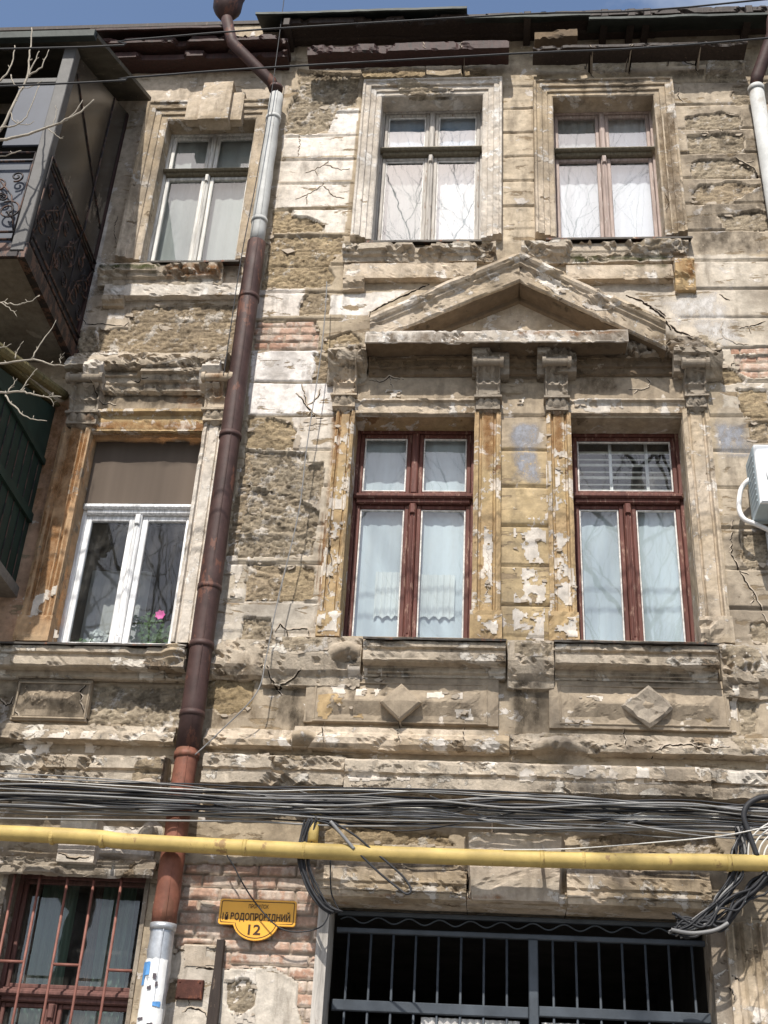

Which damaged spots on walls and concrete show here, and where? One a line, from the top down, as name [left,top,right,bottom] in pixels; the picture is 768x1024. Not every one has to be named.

flaking render [286,67,457,135]
flaking render [685,60,768,232]
flaking render [77,303,238,361]
flaking render [253,212,366,380]
crack [626,294,765,382]
peeling [544,414,568,510]
flaking render [225,418,349,654]
peeling [483,526,493,603]
peeling [478,615,498,634]
peeling [513,528,578,658]